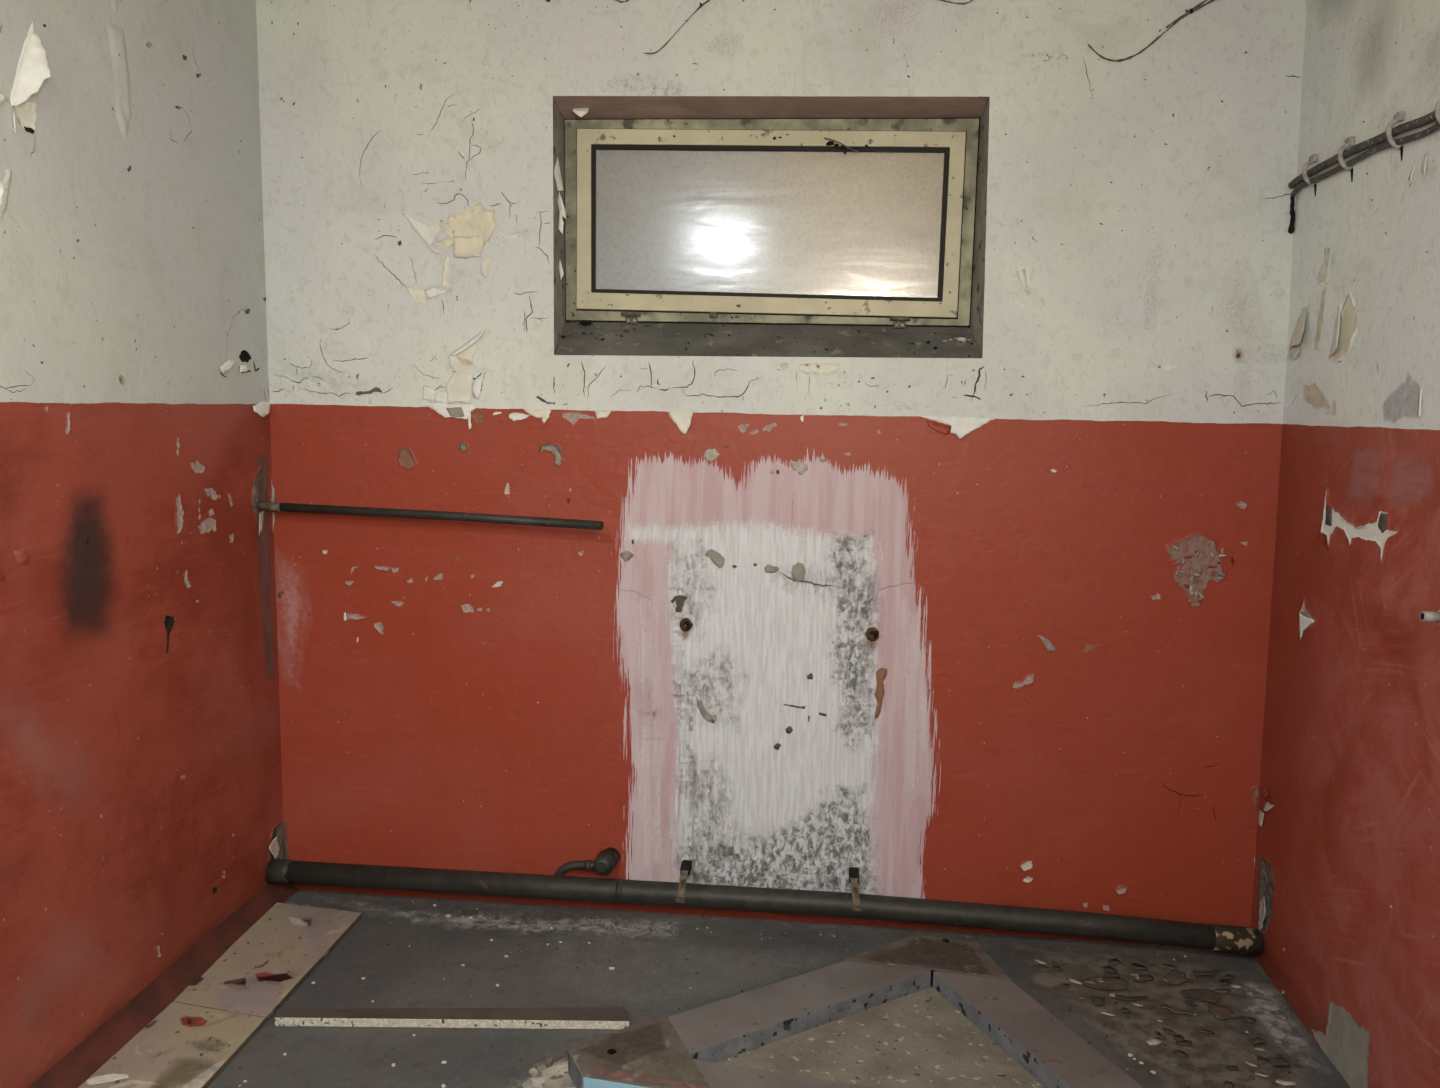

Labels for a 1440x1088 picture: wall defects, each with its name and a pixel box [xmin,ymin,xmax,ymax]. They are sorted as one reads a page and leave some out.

peeling [0,20,51,155]
crack [358,130,402,246]
crack [413,94,550,333]
crack [264,323,438,399]
crack [553,362,758,399]
crack [945,367,987,400]
peeling [668,411,693,434]
peeling [918,415,994,439]
spalling [174,438,234,543]
peeling [1317,486,1400,570]
peeling [1165,532,1248,609]
peeling [874,668,888,719]